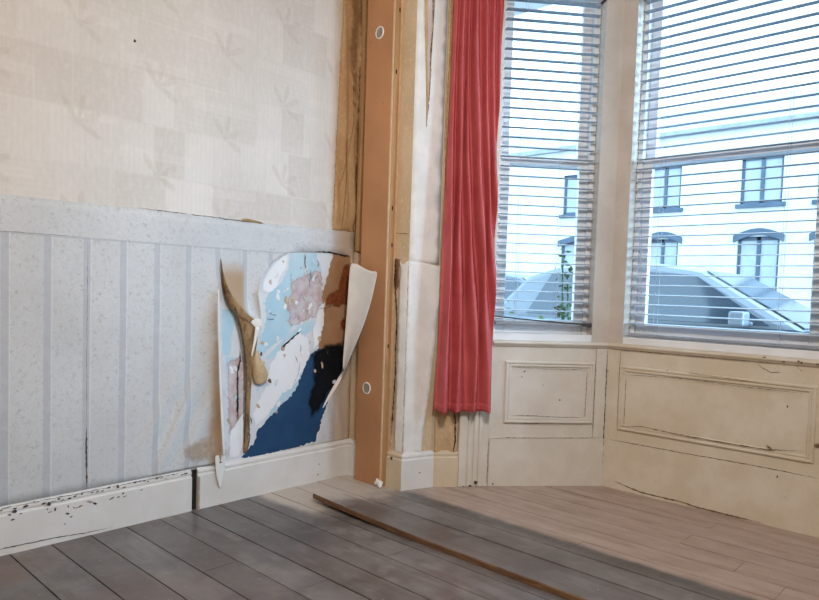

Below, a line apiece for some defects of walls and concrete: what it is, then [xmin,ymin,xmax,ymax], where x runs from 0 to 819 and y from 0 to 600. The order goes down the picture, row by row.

flaking render [424,0,435,95]
flaking render [219,252,351,462]
crack [513,349,814,478]
crack [2,527,112,549]
crack [617,482,760,523]